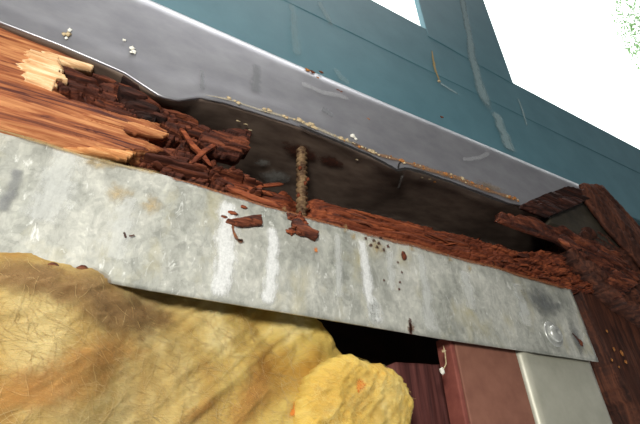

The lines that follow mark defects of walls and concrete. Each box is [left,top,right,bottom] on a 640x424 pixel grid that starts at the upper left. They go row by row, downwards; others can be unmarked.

rust [208,95,519,202]
rust [173,178,344,228]
water stain [211,202,235,296]
water stain [262,228,279,303]
water stain [359,240,381,322]
rust [360,232,568,289]